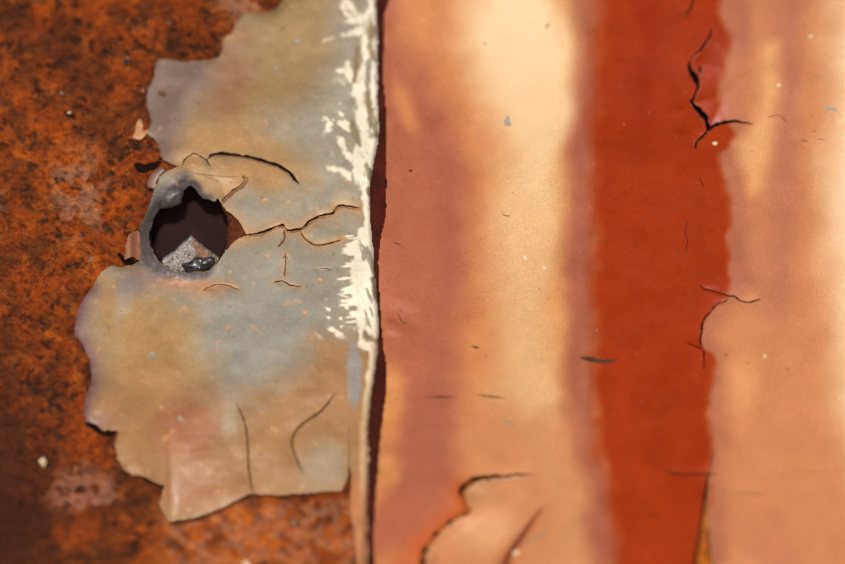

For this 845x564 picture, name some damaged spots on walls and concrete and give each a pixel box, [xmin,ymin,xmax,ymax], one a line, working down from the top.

rust [52,156,104,224]
peeling [133,119,151,140]
crack [134,161,162,173]
crack [182,152,299,203]
crack [688,28,748,149]
peeling [83,231,154,340]
peeling [139,0,379,495]
crack [242,204,362,287]
rust [373,0,845,564]
crack [686,285,757,368]
rust [50,469,116,513]
peeling [419,473,548,564]